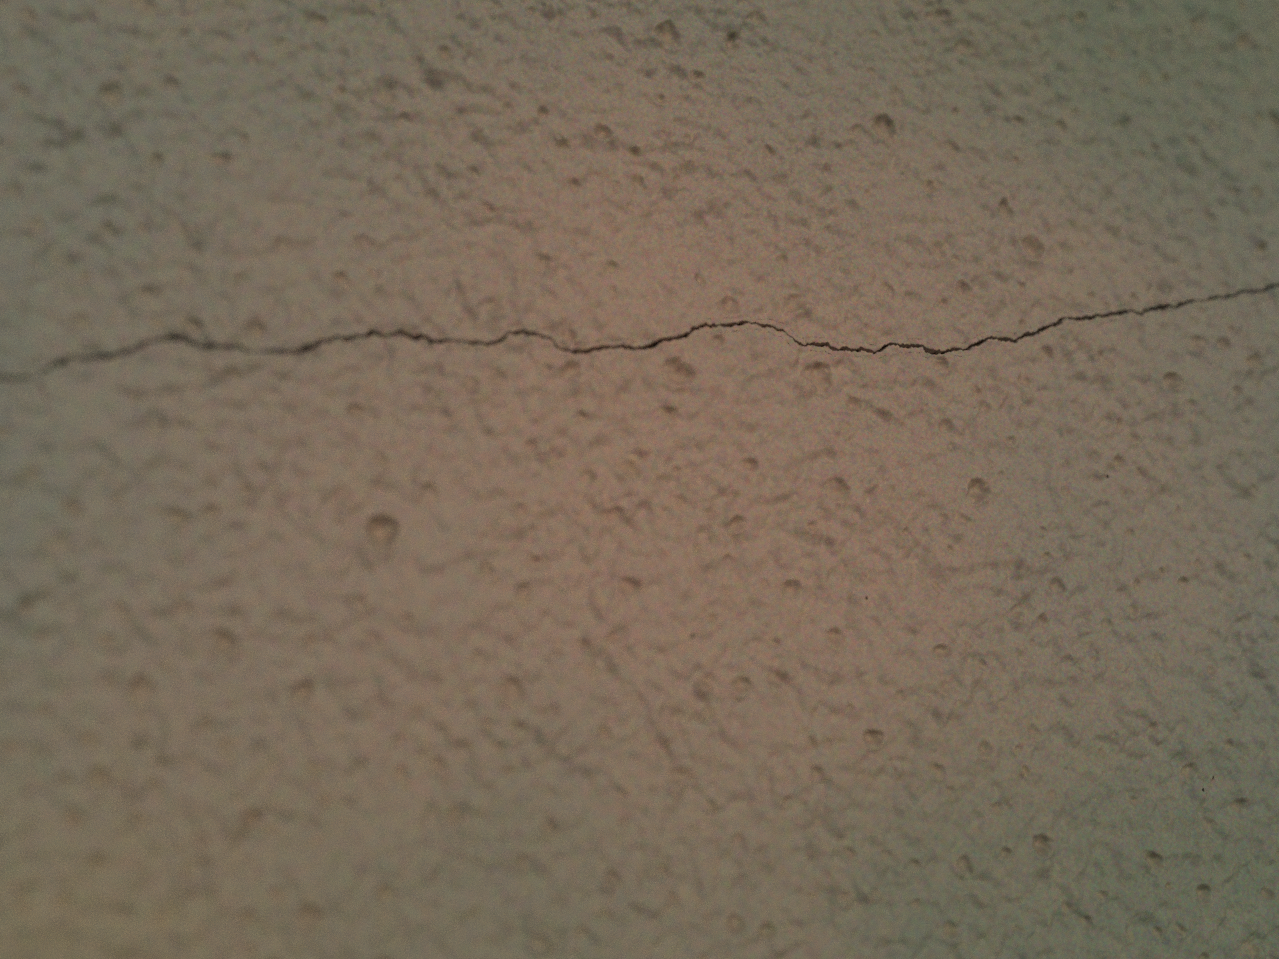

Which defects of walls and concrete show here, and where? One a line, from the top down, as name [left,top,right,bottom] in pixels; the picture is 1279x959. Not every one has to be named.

crack [0,279,1279,400]